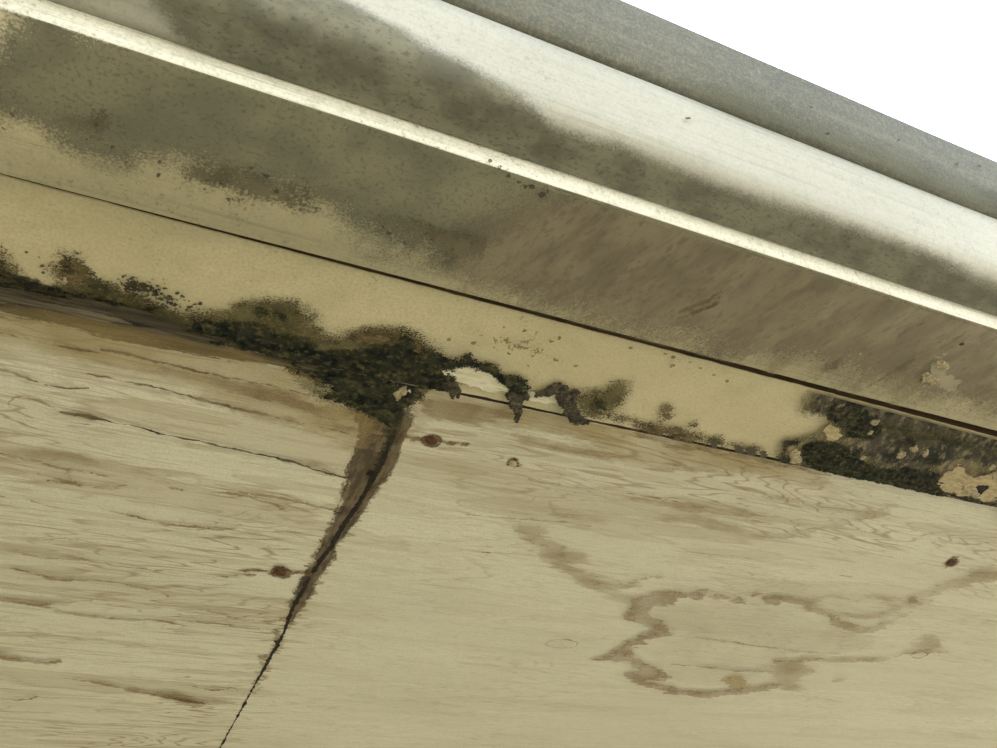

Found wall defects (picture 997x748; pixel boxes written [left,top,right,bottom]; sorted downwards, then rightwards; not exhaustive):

leakage [0,246,462,429]
leakage [471,327,561,366]
rust [394,433,469,448]
leakage [574,379,997,507]
peeling [928,464,997,502]
crack [0,345,414,748]
rust [239,566,318,579]
leakage [625,589,719,622]
leakage [593,623,747,698]